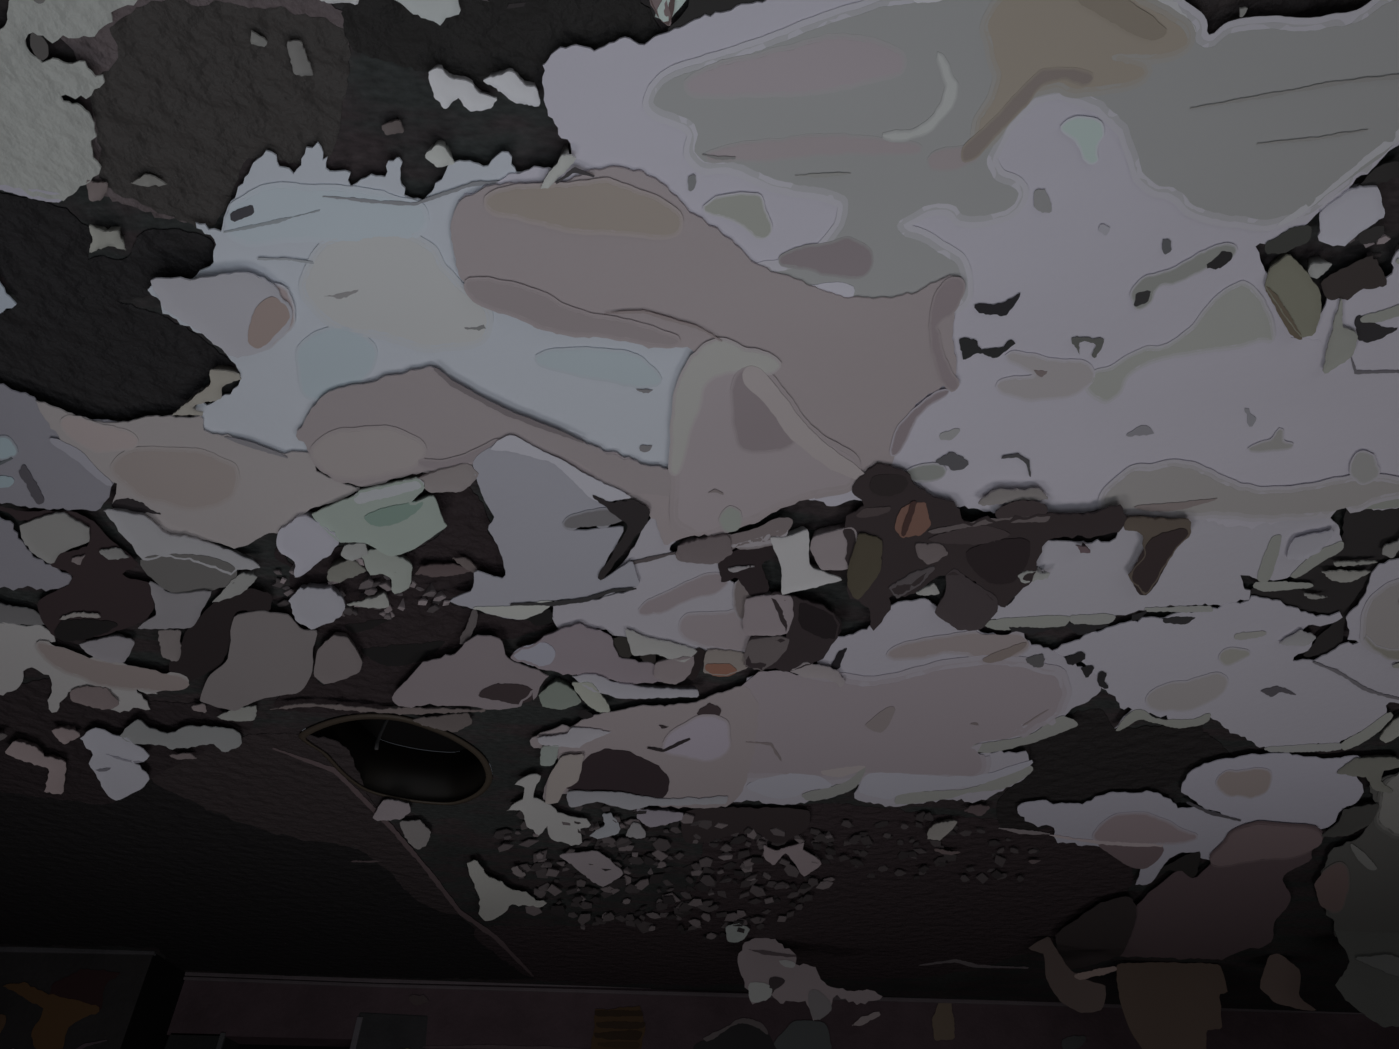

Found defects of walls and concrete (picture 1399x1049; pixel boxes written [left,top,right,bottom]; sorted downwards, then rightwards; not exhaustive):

spalling [1185,0,1371,34]
spalling [1207,251,1233,270]
peeling [1264,161,1399,374]
spalling [974,293,1020,316]
spalling [1134,290,1151,307]
spalling [959,338,1015,360]
spalling [1072,337,1104,358]
spalling [936,428,969,471]
spalling [1250,508,1399,658]
spalling [0,463,1234,1049]
peeling [1321,714,1399,837]
peeling [1260,954,1316,1011]